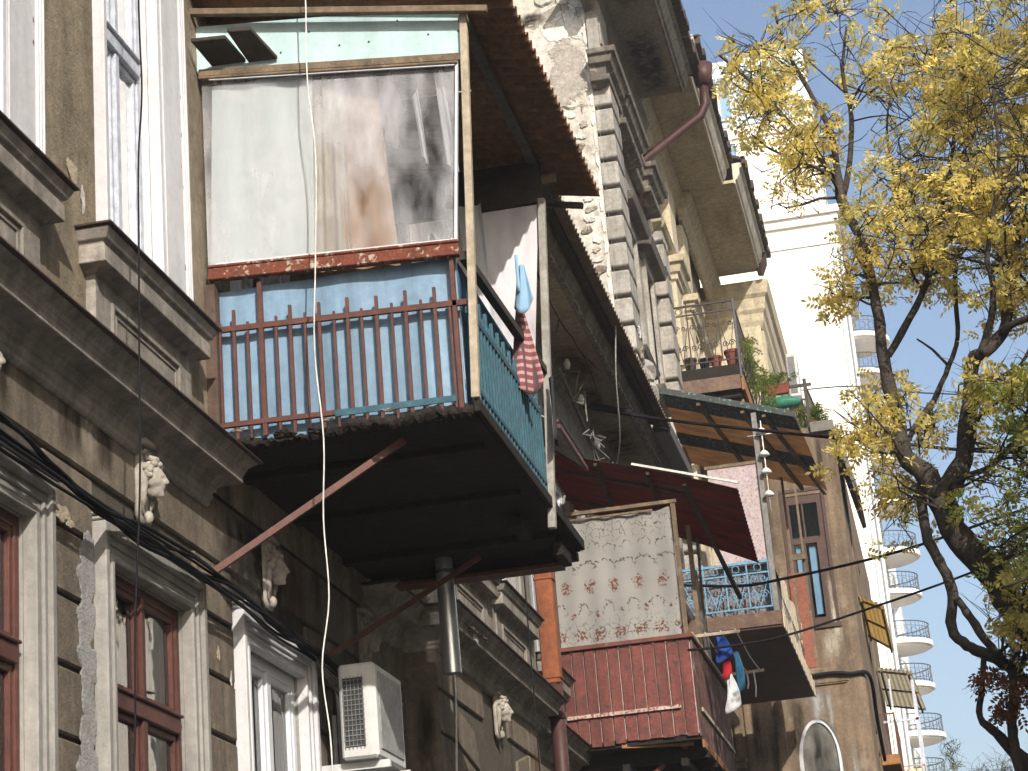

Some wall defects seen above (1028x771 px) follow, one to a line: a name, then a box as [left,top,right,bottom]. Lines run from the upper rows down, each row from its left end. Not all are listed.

flaking render [528,0,613,296]
flaking render [56,504,99,771]